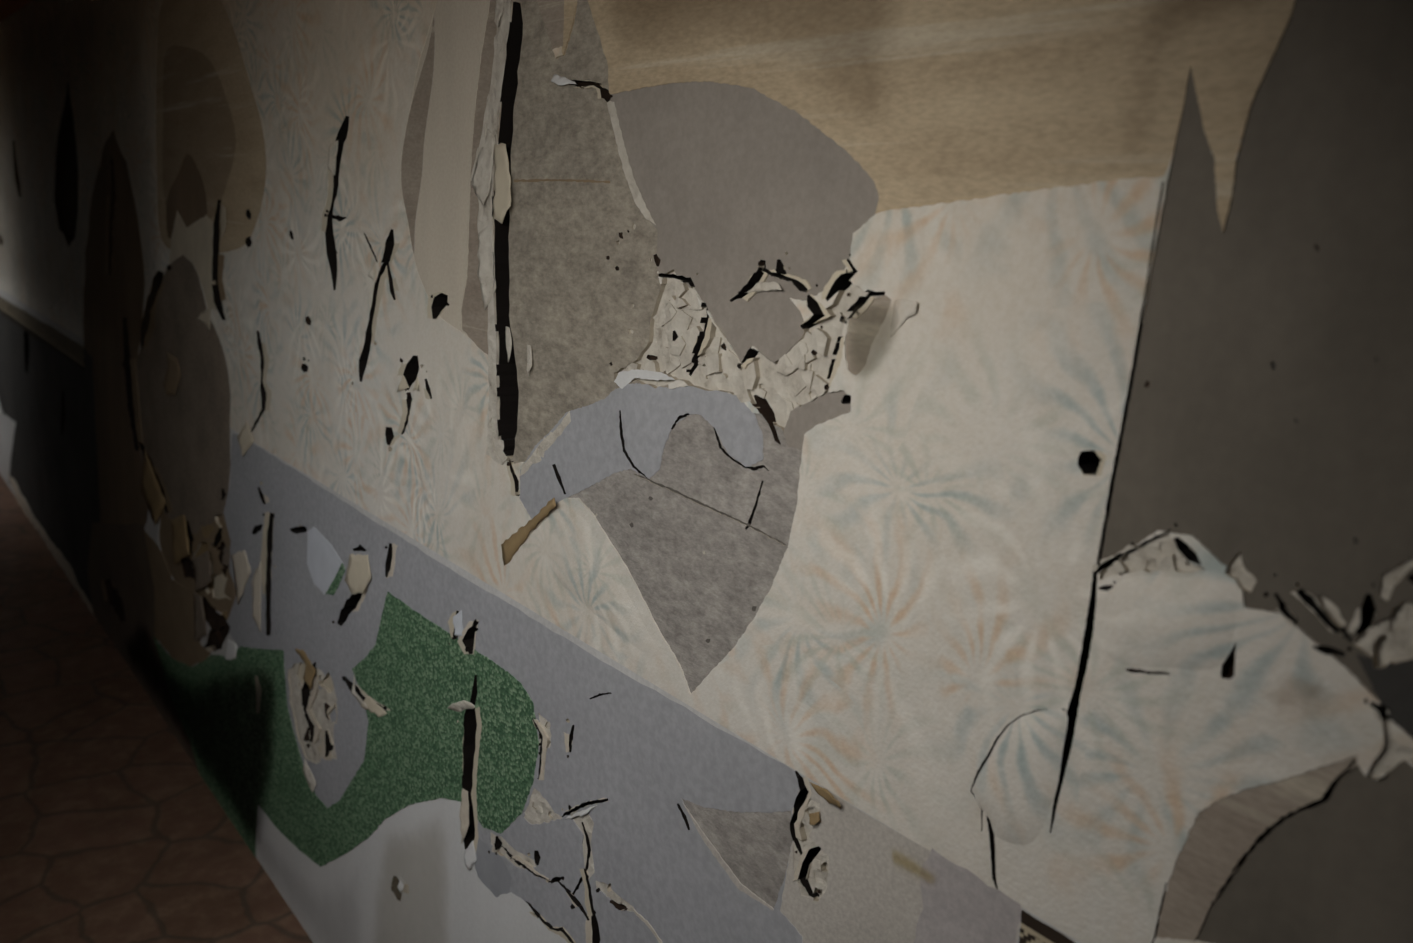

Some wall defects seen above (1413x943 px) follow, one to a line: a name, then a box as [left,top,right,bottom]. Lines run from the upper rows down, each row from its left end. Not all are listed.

crack [321,116,400,385]
crack [471,0,523,496]
peeling [0,0,1022,943]
crack [552,464,566,494]
peeling [401,0,1413,943]
crack [970,182,1201,889]
crack [1152,882,1167,943]